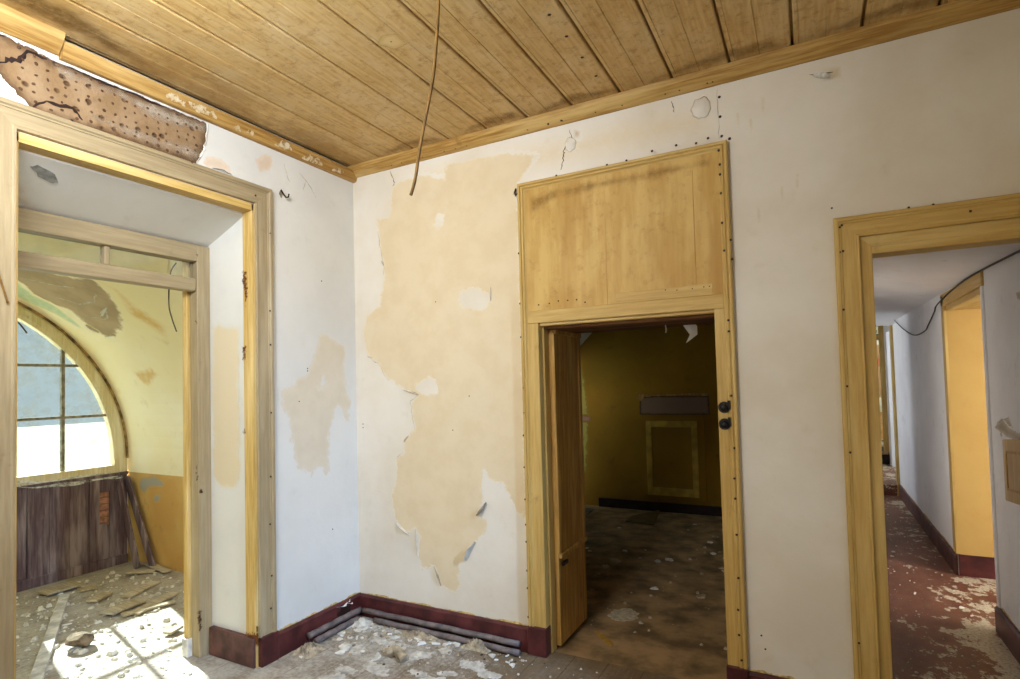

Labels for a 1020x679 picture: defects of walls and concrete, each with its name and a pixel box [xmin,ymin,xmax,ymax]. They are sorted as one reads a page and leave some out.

spalling [18,269,128,339]
peeling [278,329,352,482]
peeling [361,88,726,595]